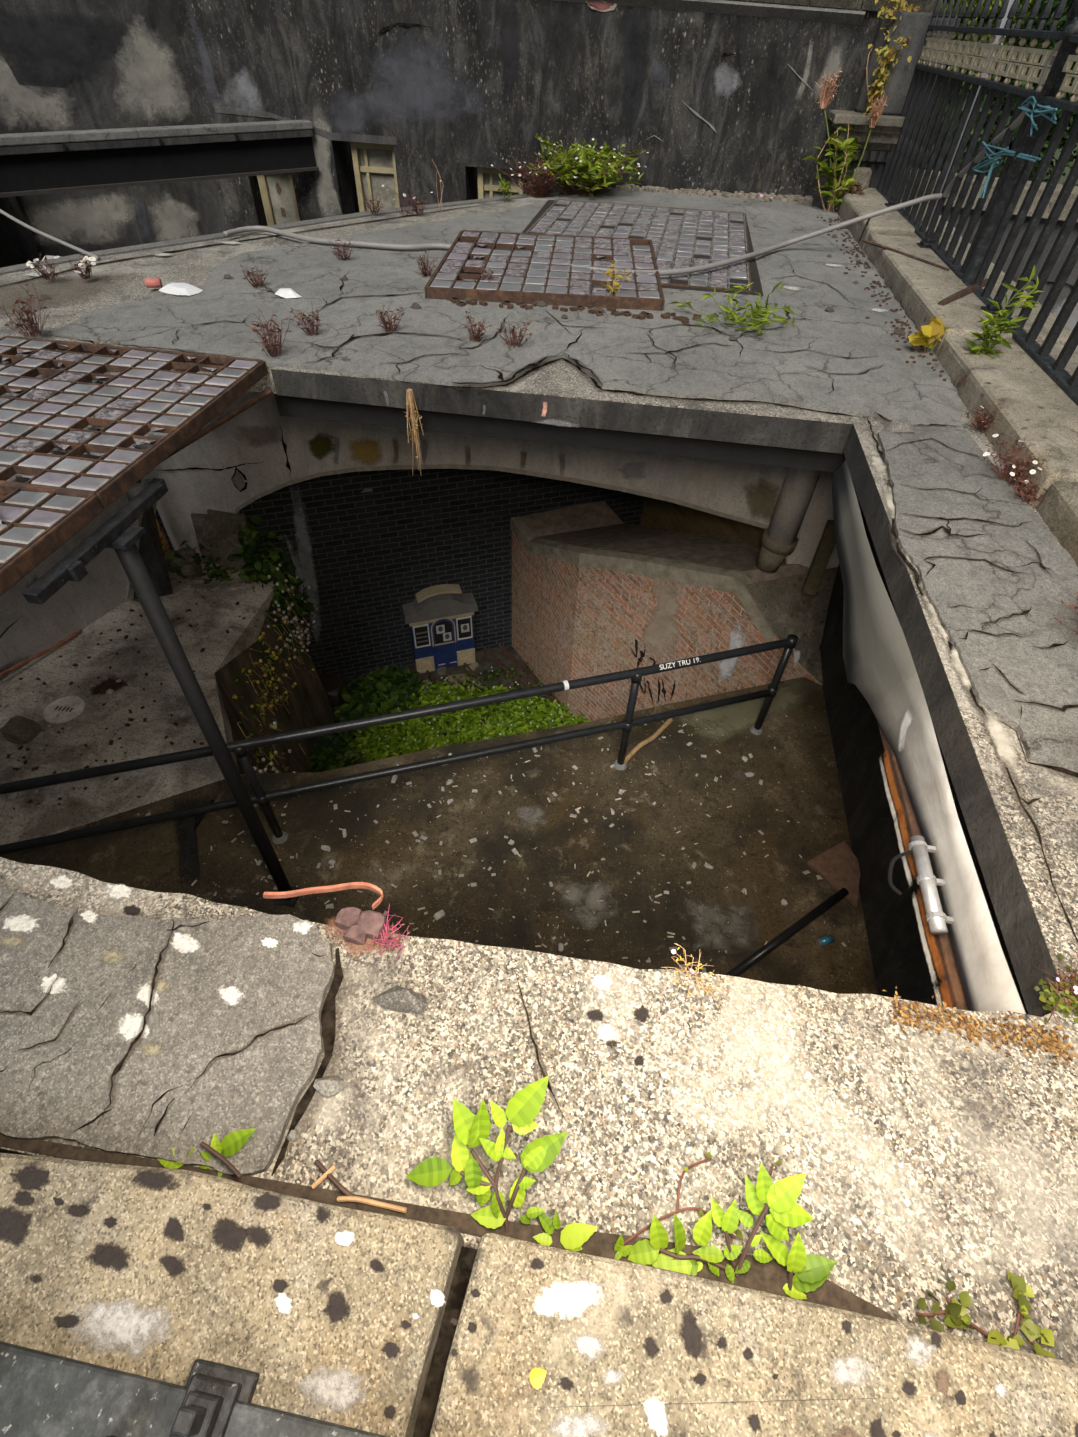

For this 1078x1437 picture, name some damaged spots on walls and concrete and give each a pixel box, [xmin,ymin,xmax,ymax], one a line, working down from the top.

damp [0,58,69,127]
damp [117,22,189,120]
damp [191,19,258,108]
damp [312,45,479,216]
damp [23,194,134,244]
damp [152,196,198,241]
crack [306,311,603,386]
crack [633,265,883,396]
crack [875,412,1078,715]
crack [0,909,207,1131]
crack [136,1014,313,1141]
crack [515,972,564,1117]